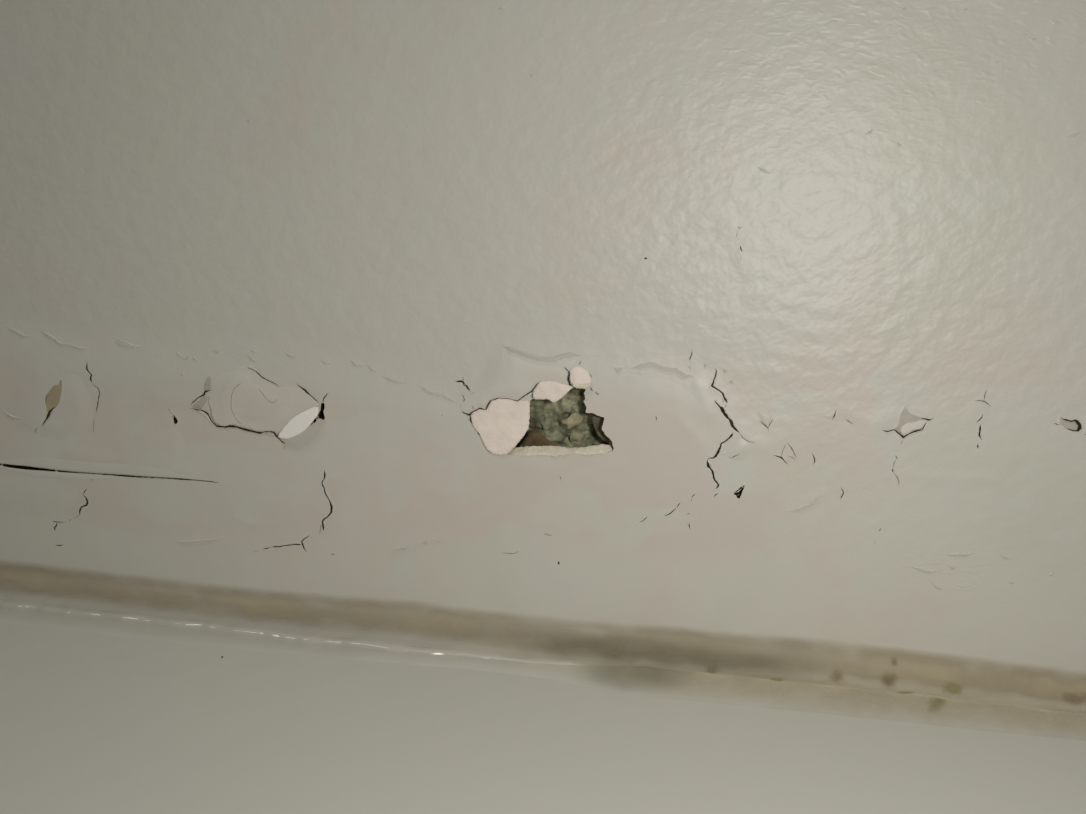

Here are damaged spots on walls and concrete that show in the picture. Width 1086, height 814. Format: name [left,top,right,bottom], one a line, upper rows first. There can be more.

spalling [35,378,64,431]
peeling [471,367,591,456]
crack [639,349,818,529]
spalling [883,405,933,439]
crack [0,457,217,548]
crack [255,470,335,556]
leakage [0,567,1086,705]